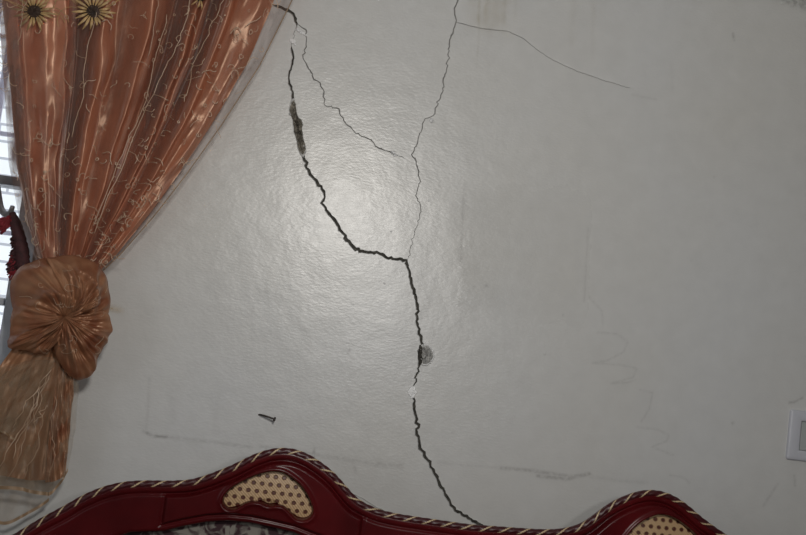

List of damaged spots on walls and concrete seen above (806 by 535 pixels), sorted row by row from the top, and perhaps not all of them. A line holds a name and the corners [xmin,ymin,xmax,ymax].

crack [272,0,629,525]